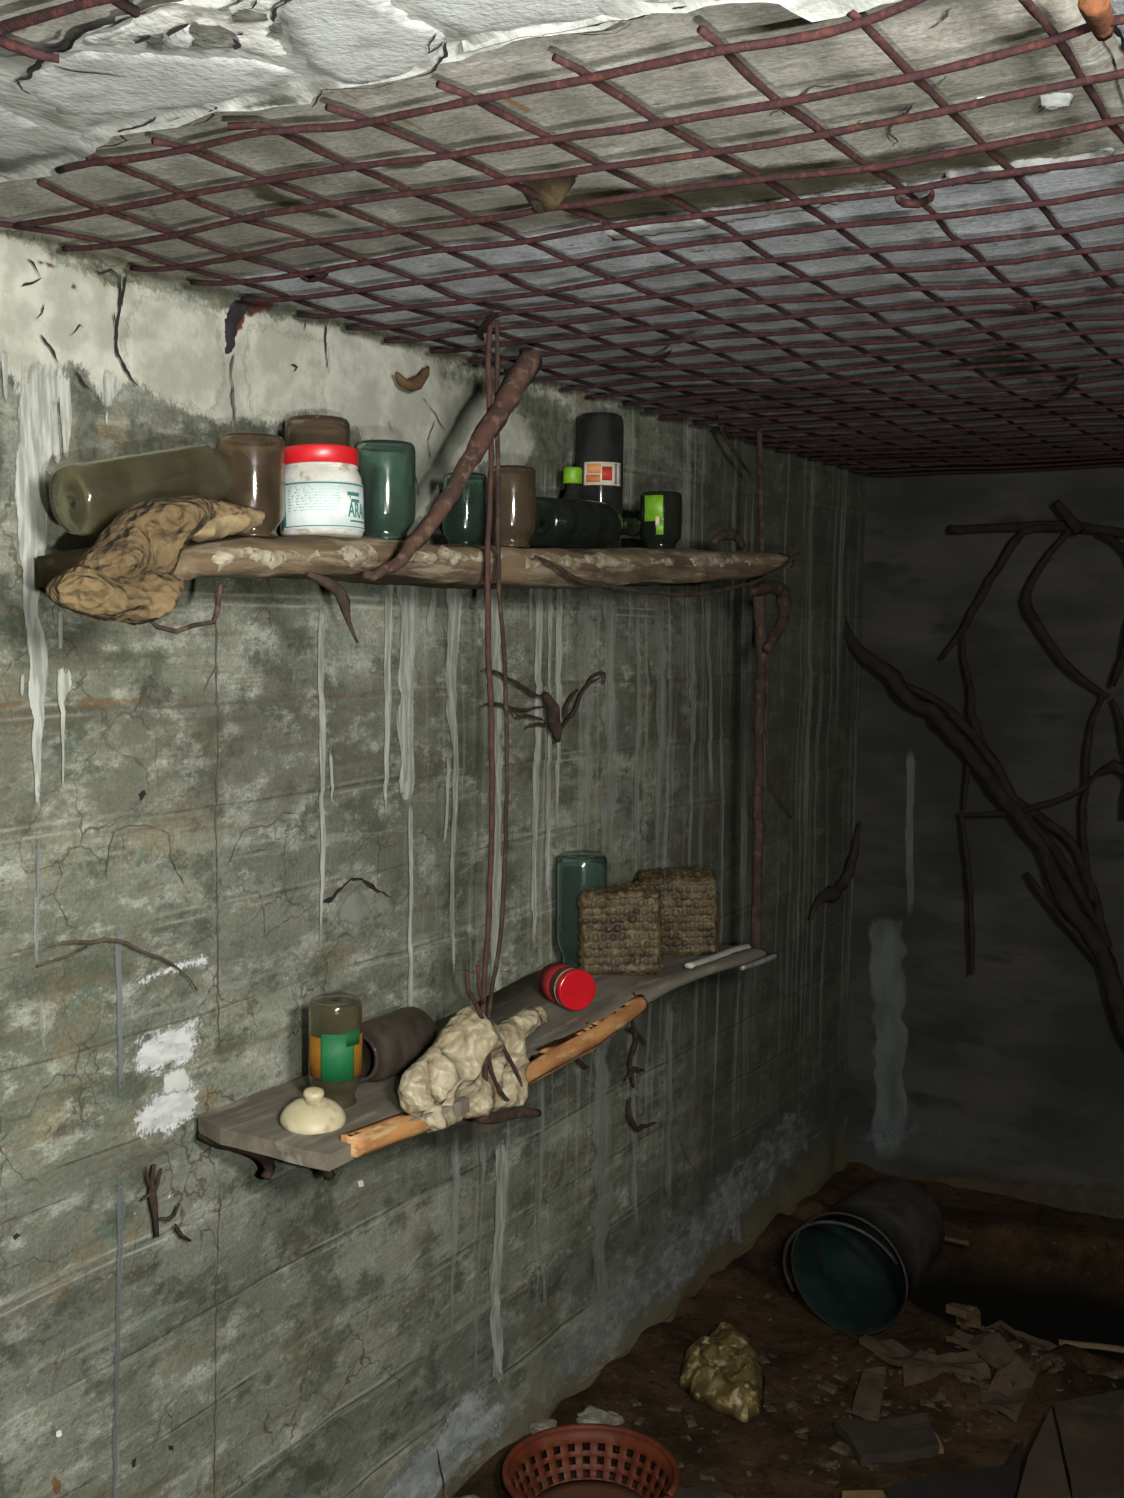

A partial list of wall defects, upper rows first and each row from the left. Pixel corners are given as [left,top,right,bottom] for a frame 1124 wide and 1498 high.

rust [298,271,330,283]
spalling [0,0,1124,524]
damp [562,138,1071,225]
damp [0,351,117,804]
crack [106,577,317,1055]
damp [318,604,334,945]
damp [383,585,462,1007]
damp [486,589,503,992]
crack [0,1198,68,1225]
crack [213,1179,222,1498]
damp [384,1139,517,1498]